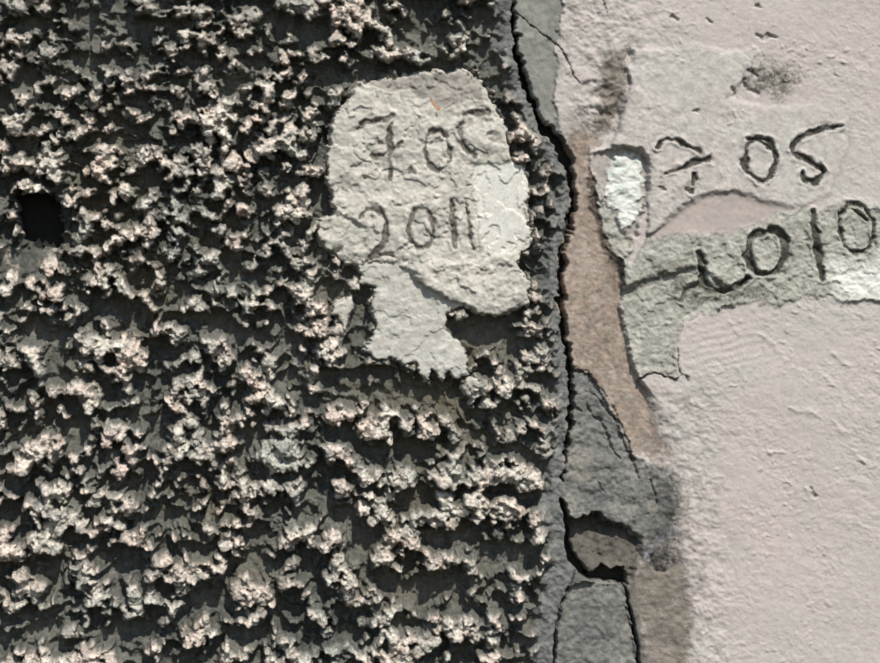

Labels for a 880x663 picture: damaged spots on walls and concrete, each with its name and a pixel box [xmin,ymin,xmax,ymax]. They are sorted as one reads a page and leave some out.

crack [509,3,635,459]
spalling [510,0,684,584]
crack [559,477,590,578]
crack [620,579,638,663]